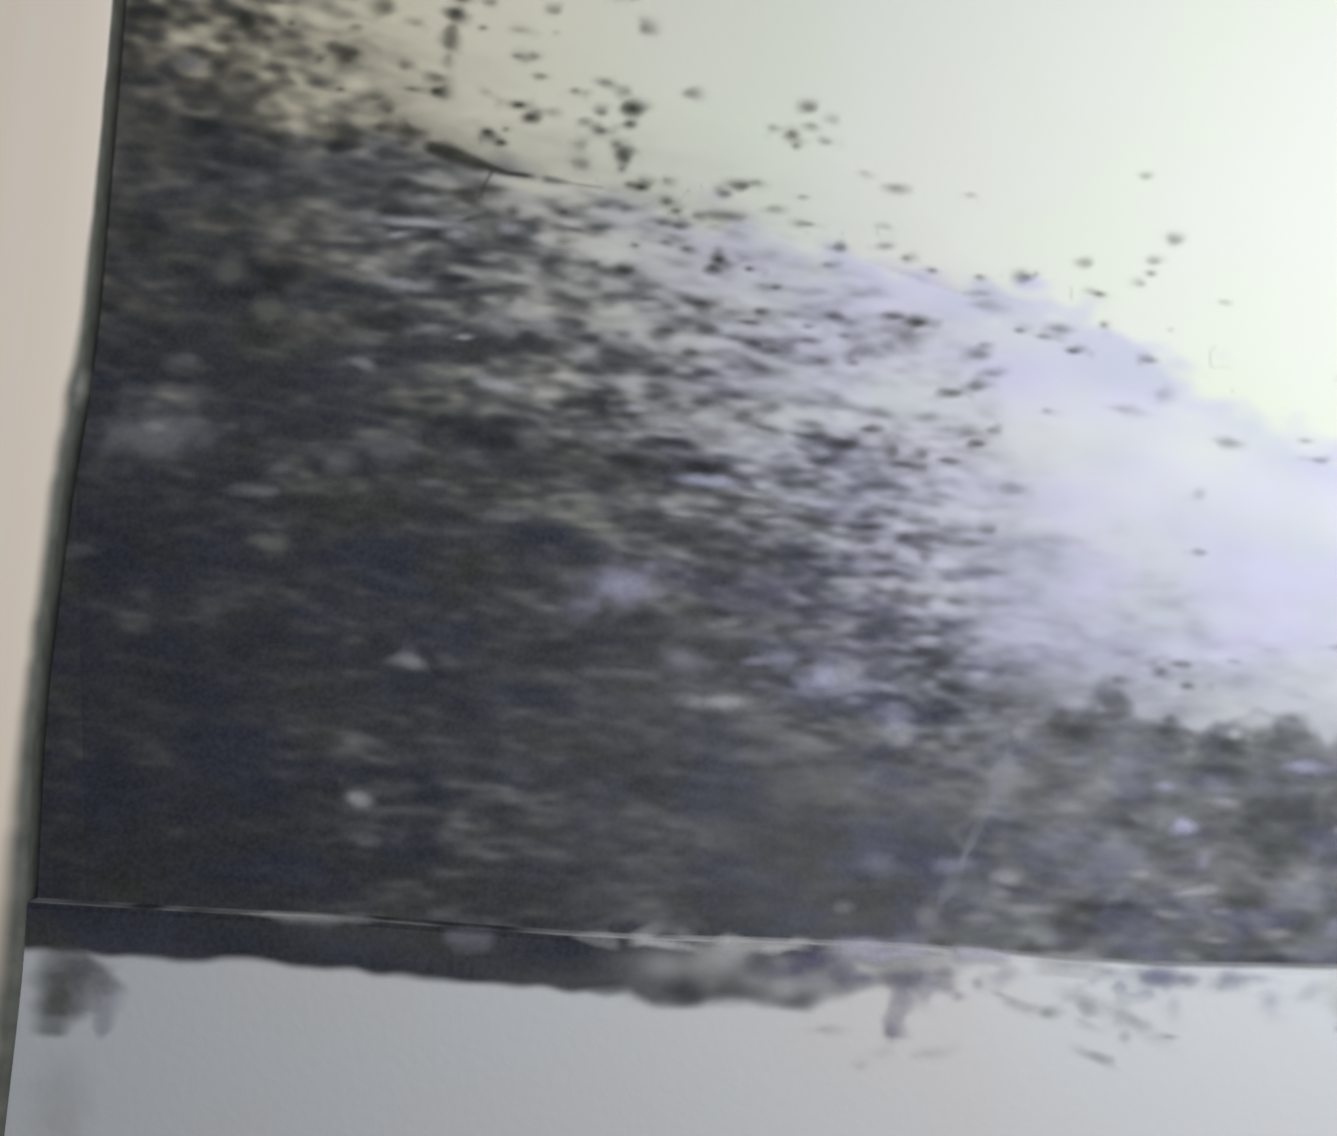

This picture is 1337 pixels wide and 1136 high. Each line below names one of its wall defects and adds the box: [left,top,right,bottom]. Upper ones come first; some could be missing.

water stain [25,0,1023,1003]
water stain [960,696,1337,964]